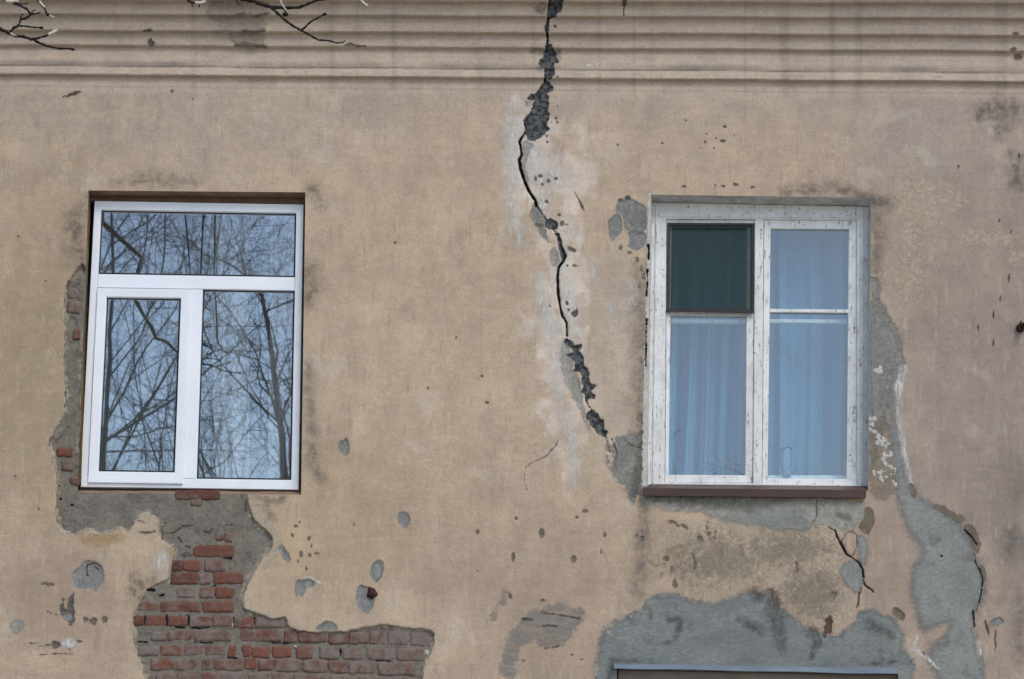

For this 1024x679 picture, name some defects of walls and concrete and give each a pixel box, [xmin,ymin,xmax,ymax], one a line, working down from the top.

crack [503,0,610,481]
flaking render [608,192,652,487]
peeling [868,416,917,499]
flaking render [30,639,82,655]
flaking render [47,560,108,626]
flaking render [252,506,322,597]
flaking render [356,560,384,614]
flaking render [823,615,833,638]
crack [811,499,874,607]
flaking render [859,507,874,535]
flaking render [933,505,986,580]
crack [964,529,997,647]